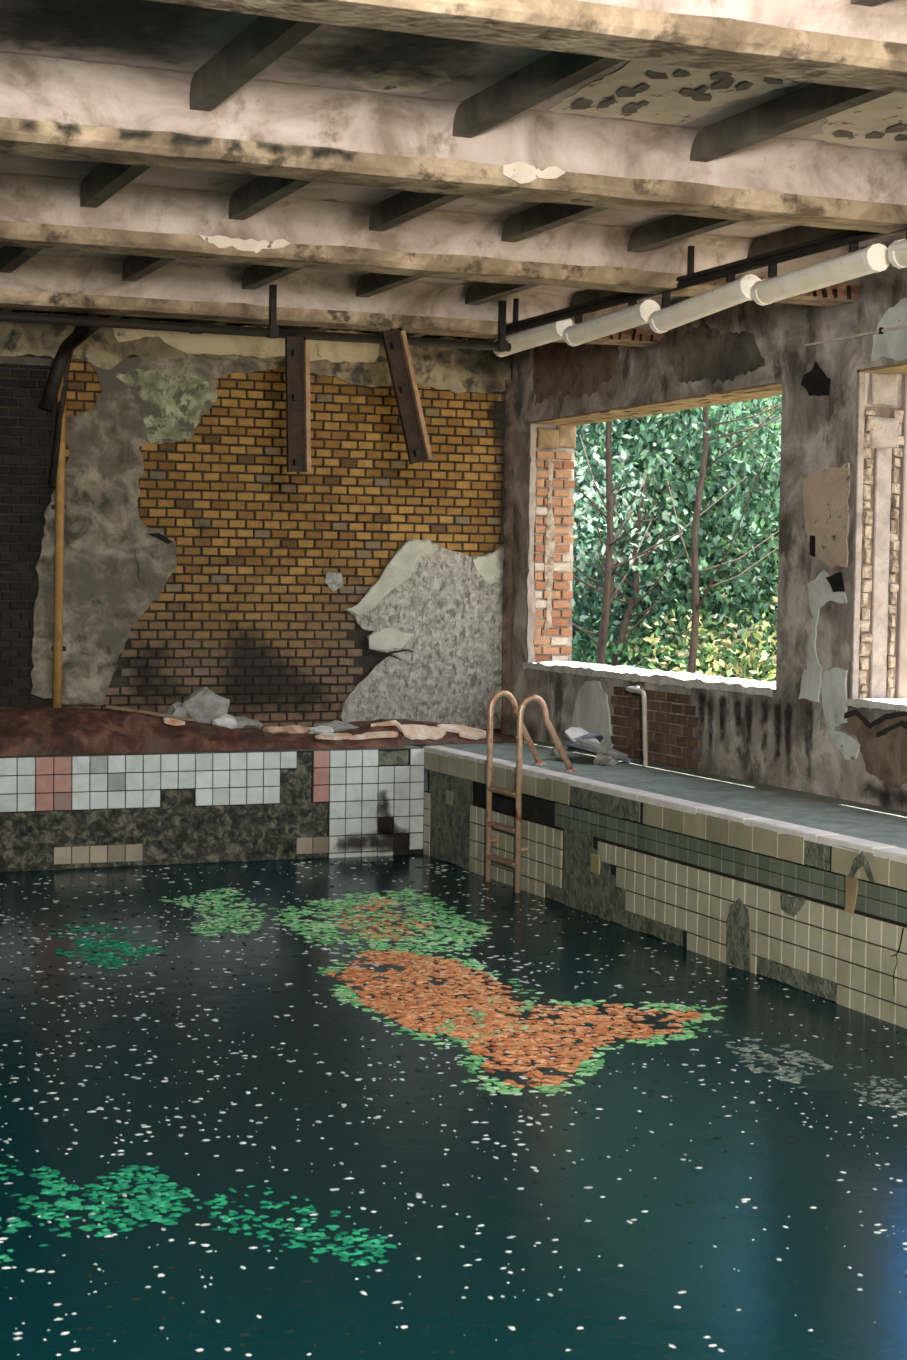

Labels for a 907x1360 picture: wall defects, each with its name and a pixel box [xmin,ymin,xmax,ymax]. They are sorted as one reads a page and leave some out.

peeling [550,61,797,124]
peeling [810,92,907,151]
peeling [871,298,907,362]
flaking render [0,356,505,871]
spalling [799,410,907,788]